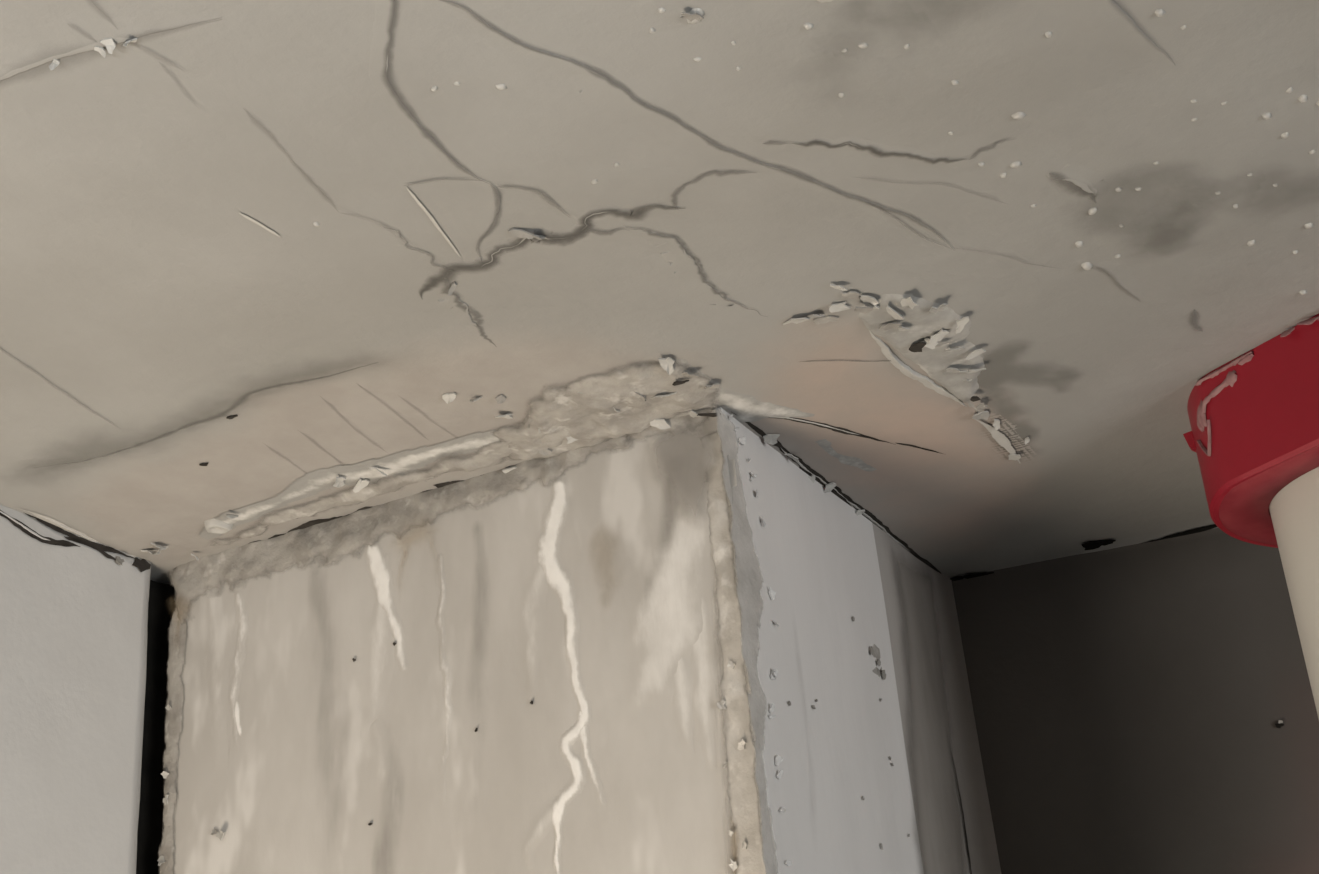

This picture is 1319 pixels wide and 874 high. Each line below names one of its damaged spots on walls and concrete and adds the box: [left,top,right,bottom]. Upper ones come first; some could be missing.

crack [49,58,60,70]
crack [92,0,137,58]
crack [369,0,1007,345]
crack [1046,164,1109,203]
crack [0,505,135,560]
leakage [202,588,250,776]
leakage [361,541,413,874]
leakage [516,476,607,874]
leakage [616,455,737,771]
flaking render [442,269,1103,874]
crack [732,412,941,574]